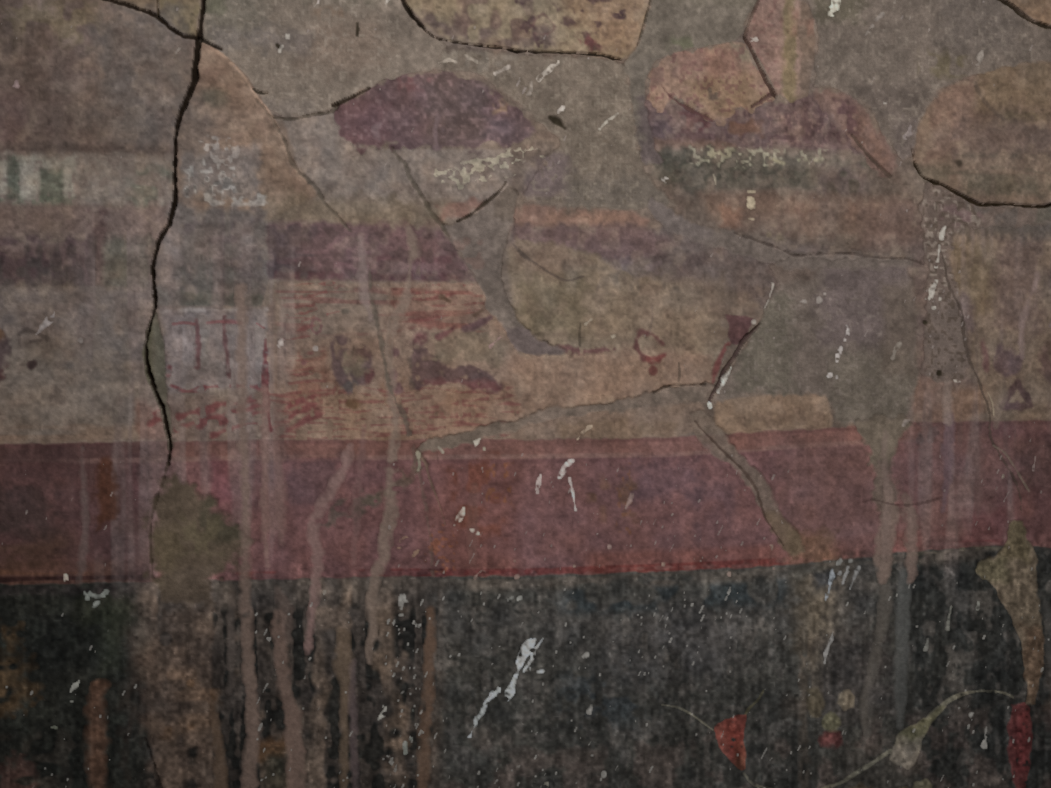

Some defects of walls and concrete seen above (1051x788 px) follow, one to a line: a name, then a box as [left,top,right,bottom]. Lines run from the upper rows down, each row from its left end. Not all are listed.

crack [401,0,652,61]
crack [998,0,1051,29]
crack [391,146,507,238]
crack [851,134,1051,209]
crack [102,0,222,580]
crack [252,87,446,578]
water stain [132,282,290,788]
water stain [269,224,430,788]
water stain [414,605,437,788]